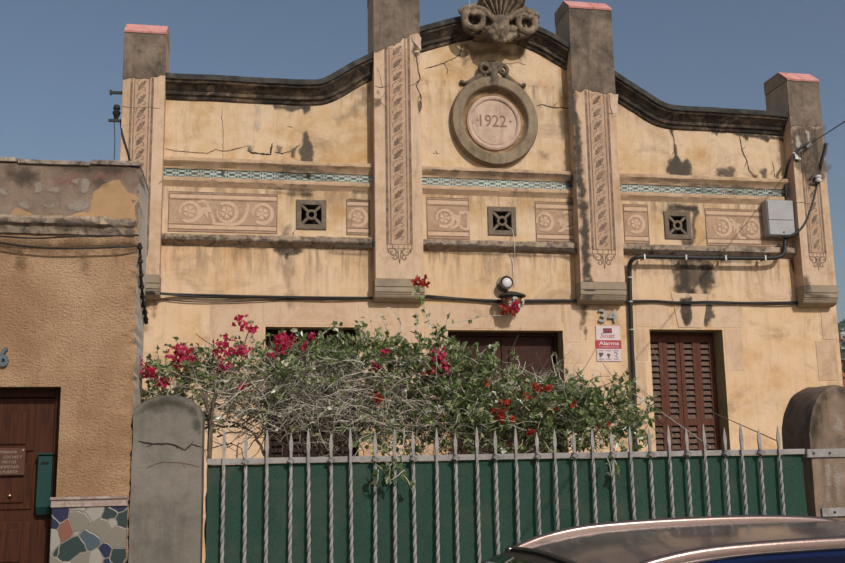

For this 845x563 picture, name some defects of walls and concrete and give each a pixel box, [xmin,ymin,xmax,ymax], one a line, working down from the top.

crack [376,45,462,106]
crack [166,108,301,155]
leakage [276,132,337,192]
leakage [664,145,764,191]
crack [739,135,775,177]
peeling [44,178,138,221]
leakage [426,75,595,334]
leakage [658,204,767,326]
crack [139,441,201,469]